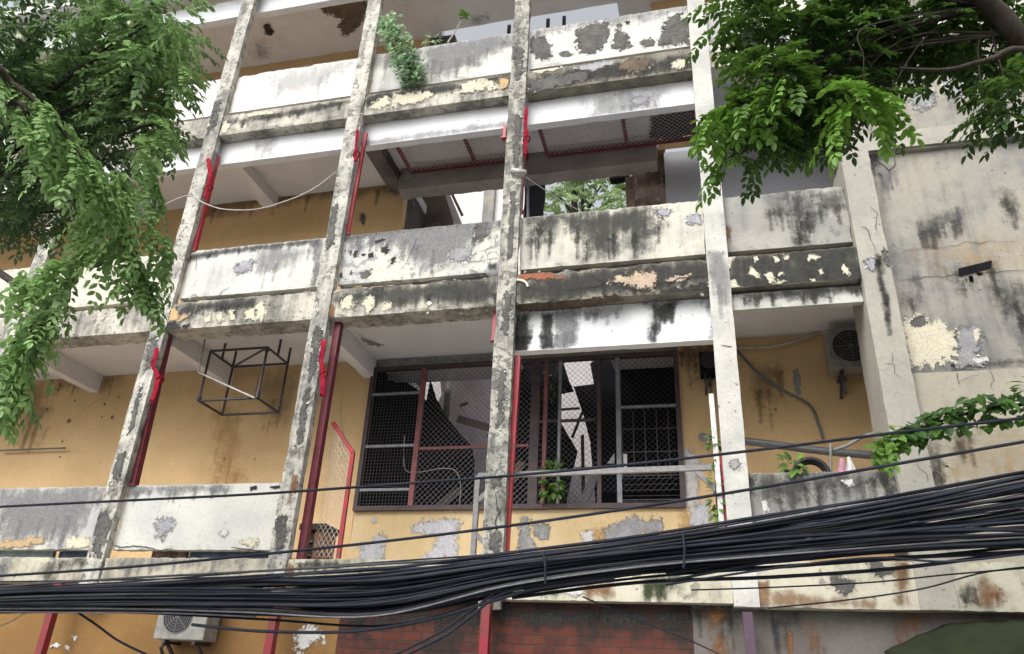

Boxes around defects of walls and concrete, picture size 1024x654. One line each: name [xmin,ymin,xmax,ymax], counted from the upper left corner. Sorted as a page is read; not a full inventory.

spalling [320,0,368,37]
peeling [340,294,392,314]
spalling [459,270,709,335]
water stain [515,206,708,351]
peeling [748,253,789,284]
water stain [730,191,863,306]
peeling [126,296,269,435]
peeling [902,312,992,370]
water stain [0,487,104,548]
peeling [410,517,464,559]
peeling [579,514,666,542]
rust [758,580,875,608]